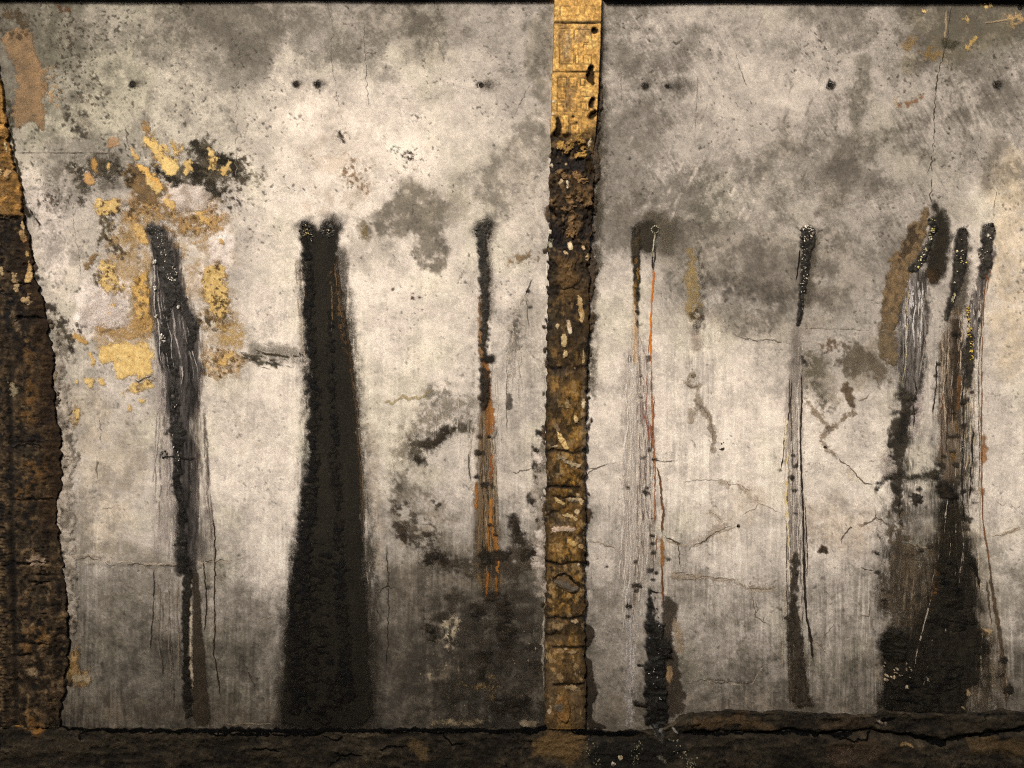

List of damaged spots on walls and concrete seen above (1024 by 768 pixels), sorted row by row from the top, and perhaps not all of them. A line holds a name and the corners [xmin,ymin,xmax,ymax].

spalling [0,111,226,634]
water stain [96,194,241,726]
peeling [207,147,231,176]
peeling [196,261,244,379]
water stain [225,222,382,729]
water stain [385,222,546,729]
water stain [606,211,698,768]
corrosion [644,235,665,600]
water stain [780,201,1014,715]
crack [928,7,952,200]
water stain [585,740,643,766]